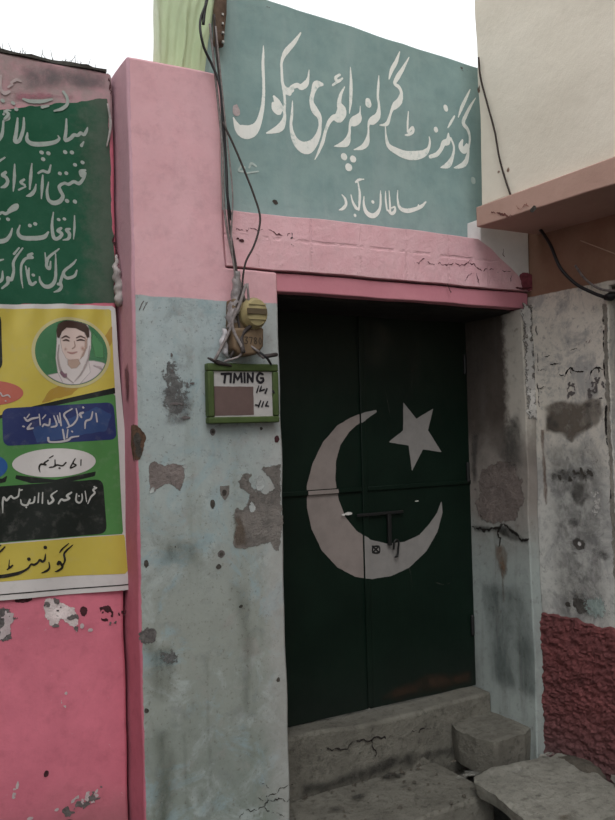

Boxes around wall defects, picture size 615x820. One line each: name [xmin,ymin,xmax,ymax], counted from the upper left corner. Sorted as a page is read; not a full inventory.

damp [546,400,600,441]
flaking render [131,424,146,460]
peeling [149,461,187,493]
flaking render [210,485,229,509]
peeling [233,464,283,550]
flaking render [474,461,524,524]
crack [472,524,529,546]
peeling [0,607,18,642]
peeling [44,598,93,632]
peeling [100,605,126,626]
crack [327,736,386,756]
crack [239,783,293,818]